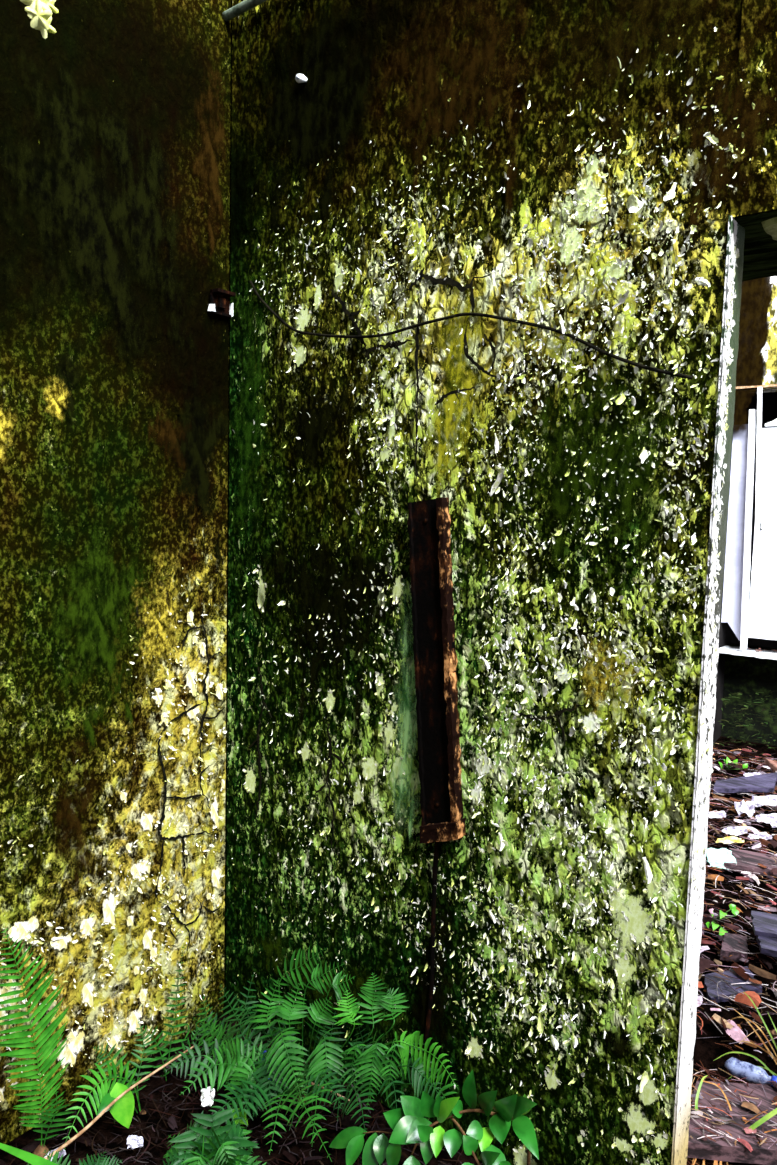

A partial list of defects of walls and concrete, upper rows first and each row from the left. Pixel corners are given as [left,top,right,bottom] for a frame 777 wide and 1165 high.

crack [136,580,225,952]